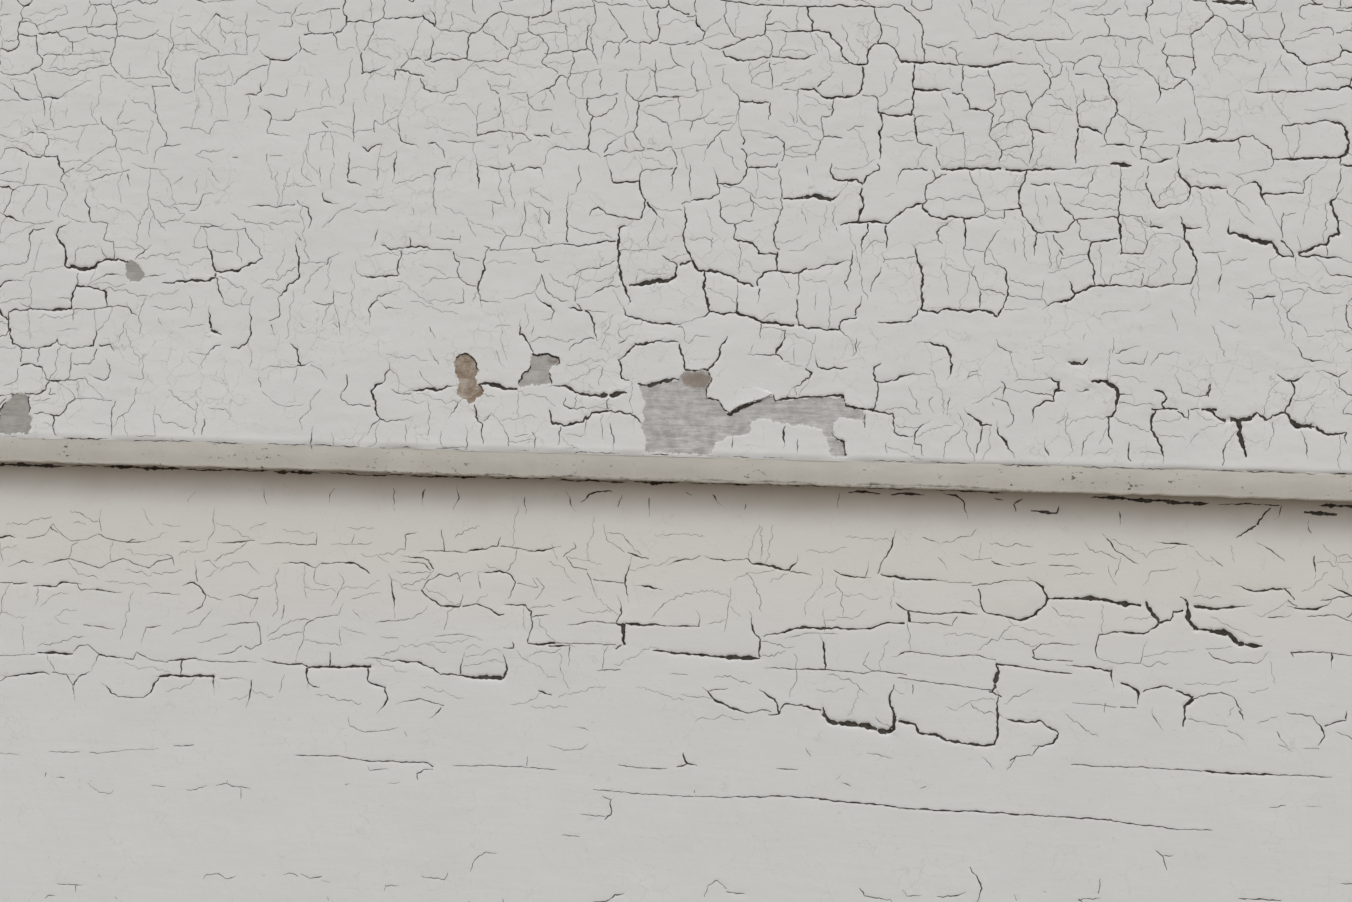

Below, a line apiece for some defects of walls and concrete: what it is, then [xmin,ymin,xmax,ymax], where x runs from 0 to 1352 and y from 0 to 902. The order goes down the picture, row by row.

peeling [125,260,144,282]
peeling [453,353,484,404]
peeling [518,353,560,388]
peeling [0,393,33,435]
peeling [639,363,874,457]
crack [0,462,1352,768]
crack [298,727,589,785]
crack [1071,764,1324,778]
crack [567,749,1209,870]
crack [859,867,983,902]